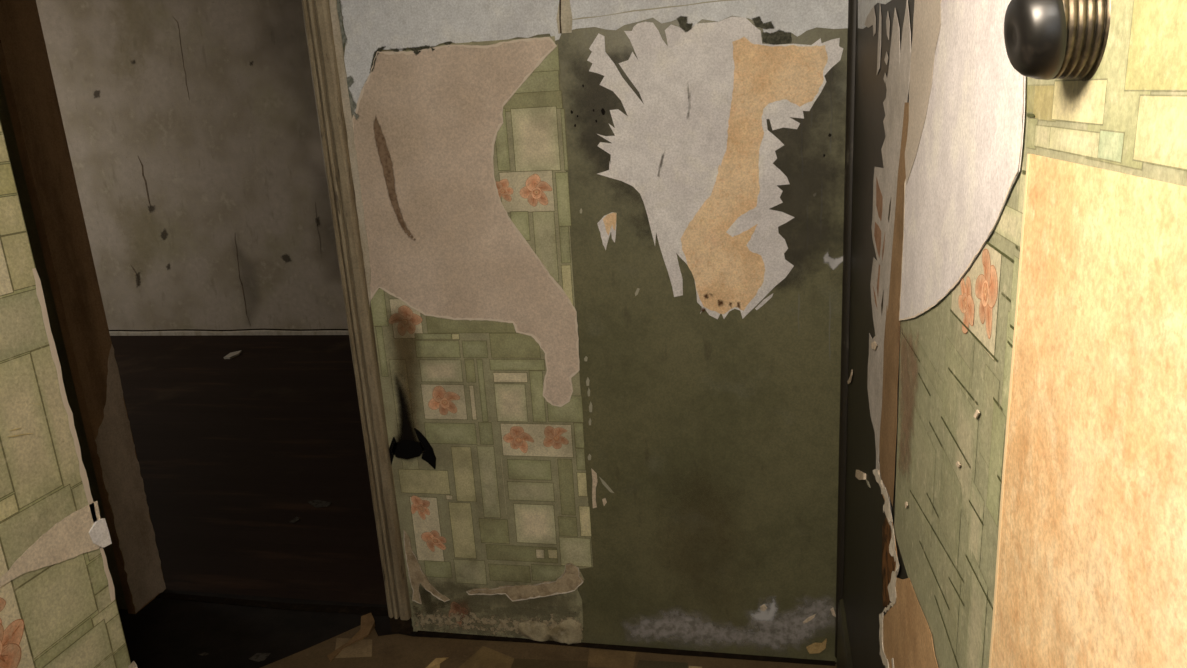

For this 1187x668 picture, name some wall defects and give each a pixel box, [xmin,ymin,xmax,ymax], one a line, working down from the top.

peeling [677,16,692,32]
peeling [752,16,791,45]
peeling [899,0,1026,321]
peeling [346,37,592,425]
peeling [597,212,617,250]
peeling [824,253,843,269]
peeling [0,345,166,613]
peeling [855,470,880,488]
peeling [882,517,896,608]
leakage [629,600,836,649]